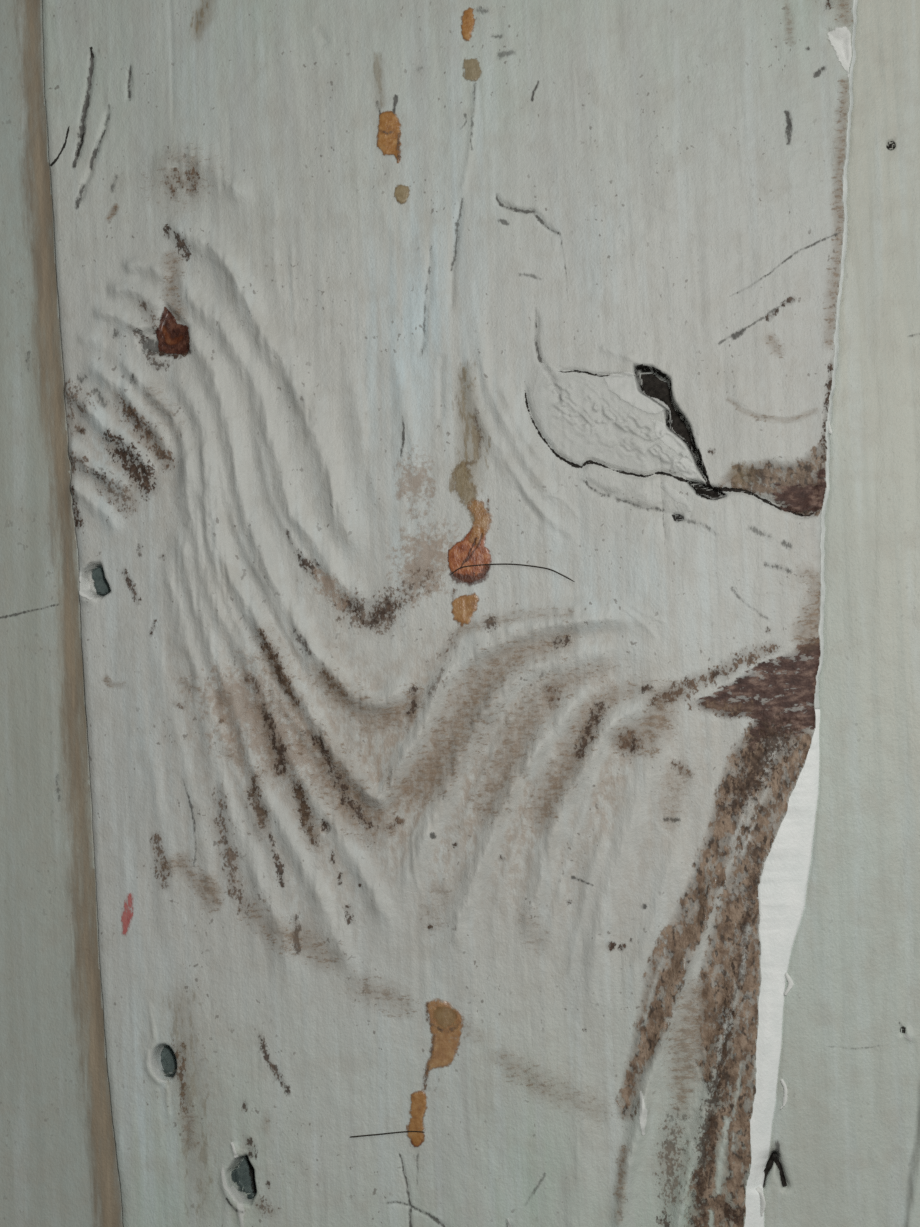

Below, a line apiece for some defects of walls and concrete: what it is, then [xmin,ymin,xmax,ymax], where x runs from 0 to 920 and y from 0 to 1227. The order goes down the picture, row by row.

water stain [64,378,90,434]
water stain [70,397,175,528]
crack [525,323,819,521]
water stain [535,591,821,1227]
spalling [744,709,820,1227]
crack [393,1154,445,1227]